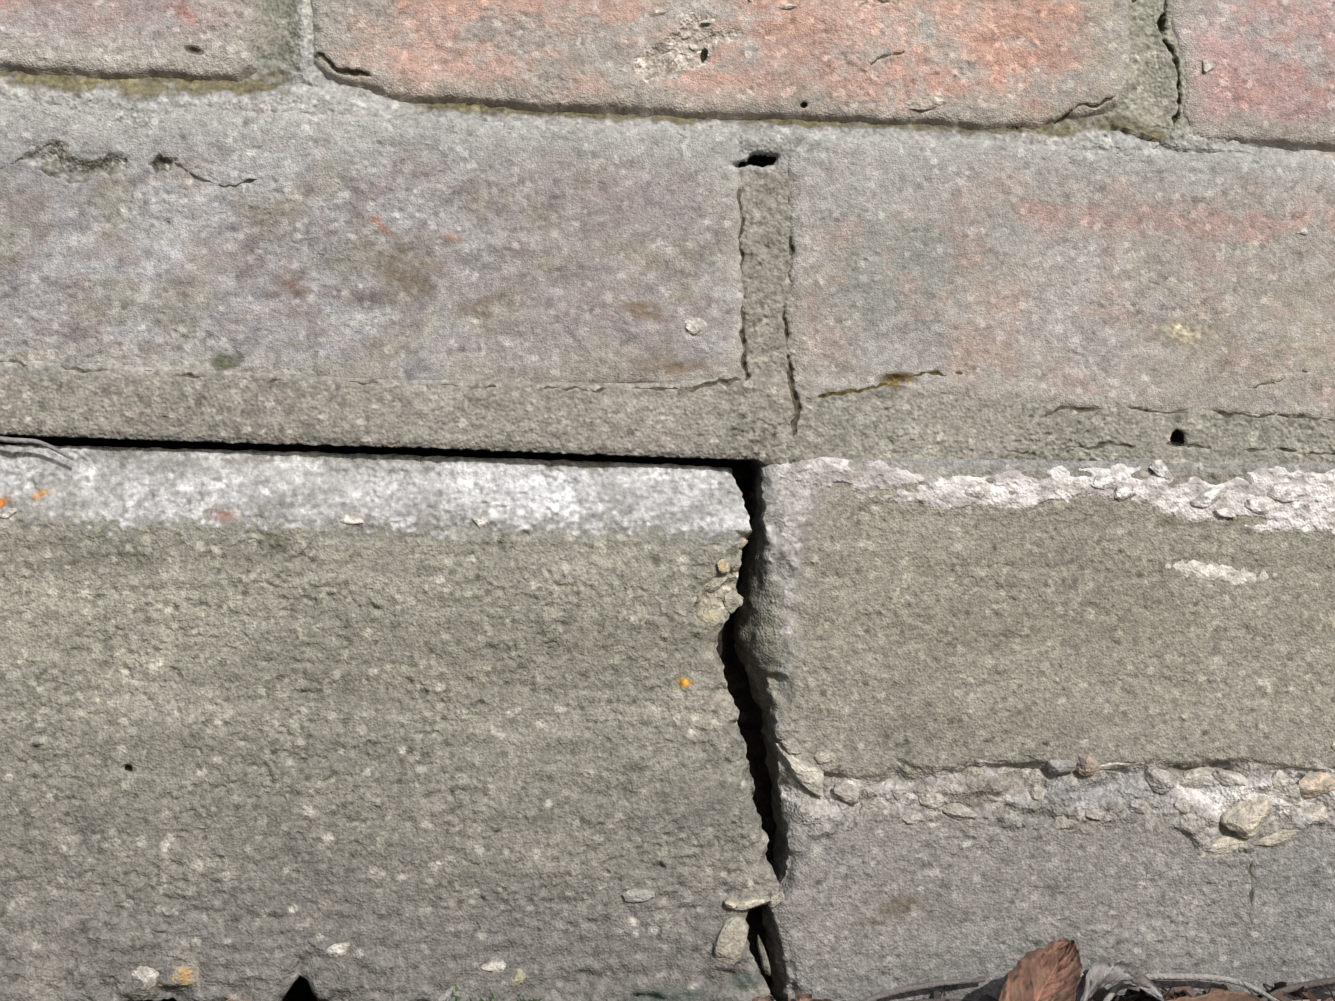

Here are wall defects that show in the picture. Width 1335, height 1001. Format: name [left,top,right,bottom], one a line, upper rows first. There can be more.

crack [1156,0,1181,147]
crack [0,359,28,367]
crack [61,365,107,373]
crack [144,370,201,378]
crack [539,189,750,393]
crack [782,196,963,436]
crack [0,435,785,996]
spalling [775,738,1335,861]
flaking render [132,966,199,990]